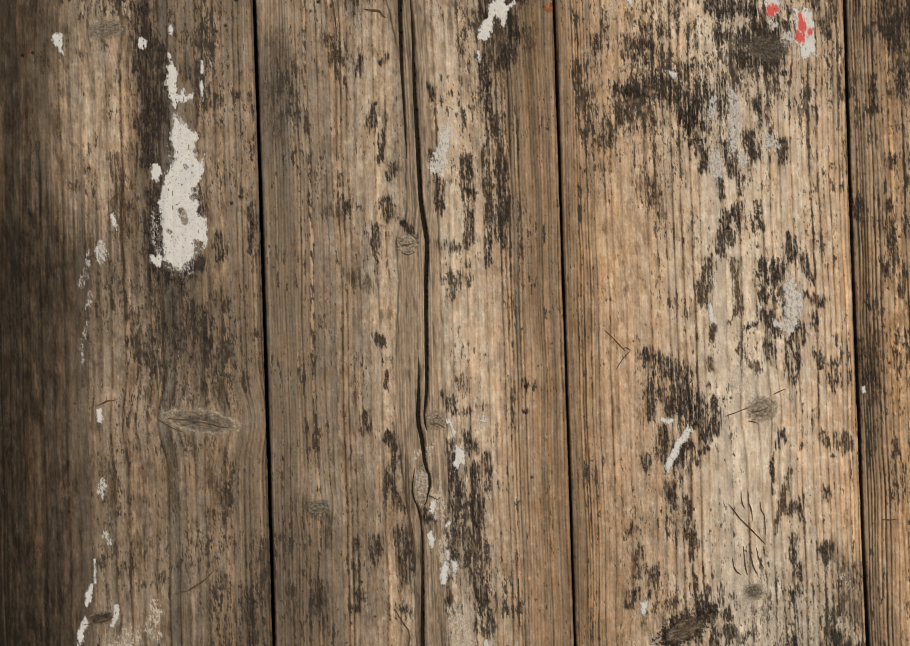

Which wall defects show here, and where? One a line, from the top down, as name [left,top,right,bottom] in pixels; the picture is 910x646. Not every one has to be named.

peeling [768,19,795,48]
peeling [151,113,199,202]
peeling [150,212,199,272]
crack [365,0,445,646]